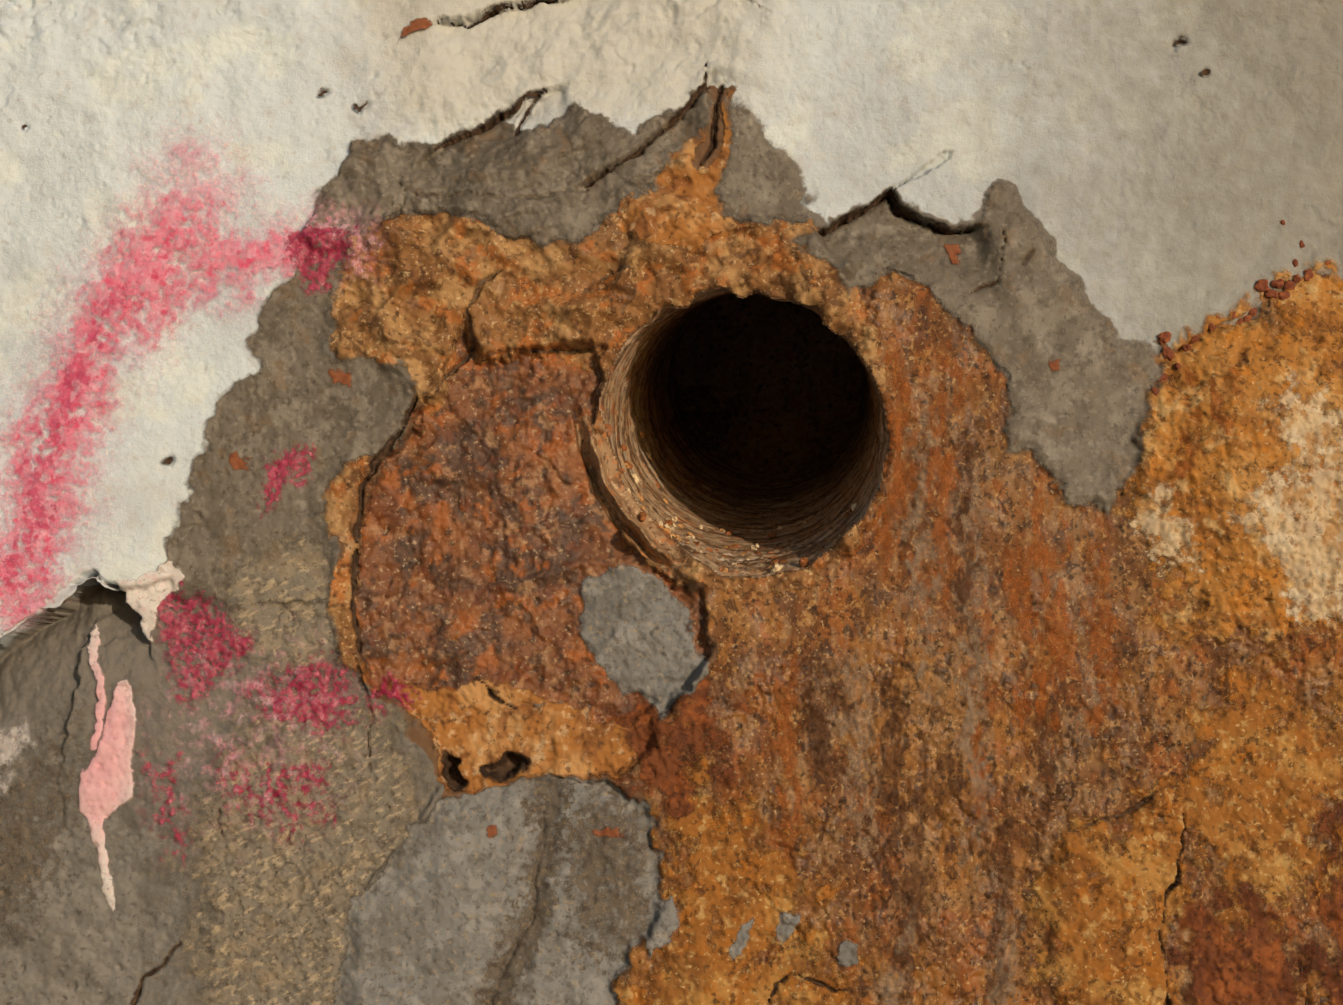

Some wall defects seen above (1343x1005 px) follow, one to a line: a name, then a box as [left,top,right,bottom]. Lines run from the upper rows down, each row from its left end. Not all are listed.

crack [438,0,561,29]
corrosion [616,91,738,254]
corrosion [944,244,961,264]
corrosion [328,368,352,387]
peeling [0,561,185,649]
spalling [179,184,893,1005]
corrosion [603,259,1343,1005]
peeling [0,723,34,793]
peeling [79,624,137,911]
corrosion [487,825,497,838]